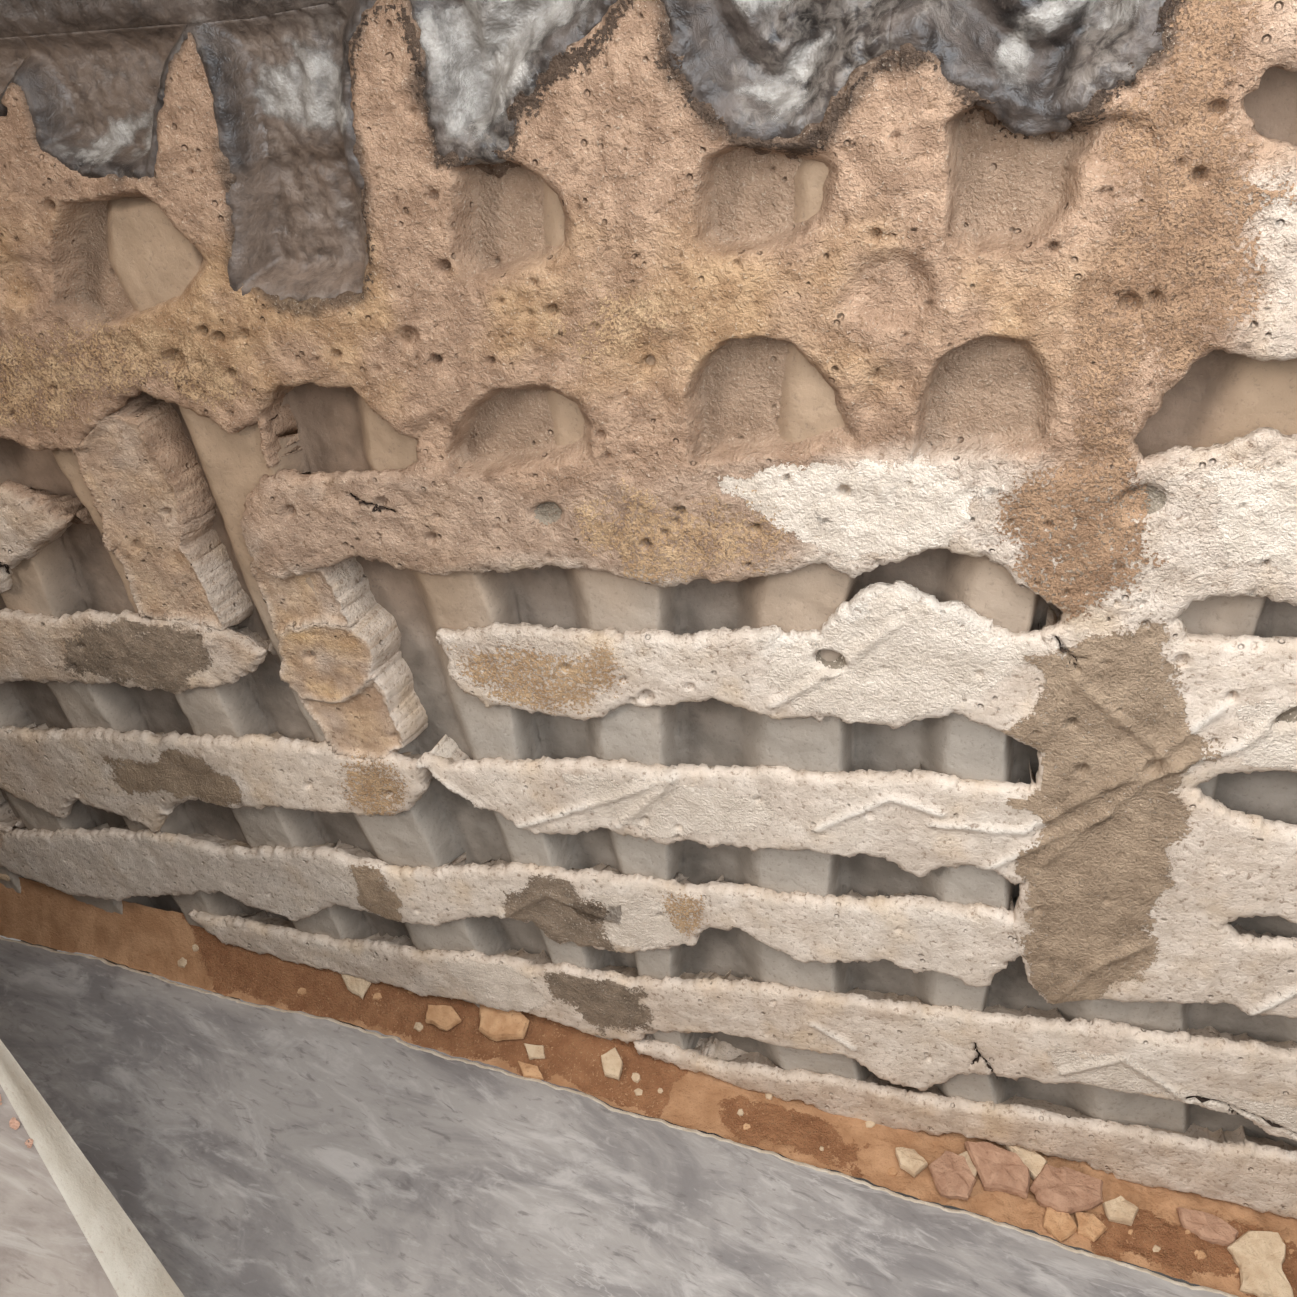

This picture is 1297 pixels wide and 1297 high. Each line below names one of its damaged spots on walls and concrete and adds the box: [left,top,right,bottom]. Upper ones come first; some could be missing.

water stain [0,0,633,315]
spalling [717,451,1012,571]
water stain [654,0,1297,1004]
spalling [1205,459,1297,574]
water stain [61,610,213,693]
spalling [758,591,1035,723]
water stain [103,748,245,808]
spalling [1236,699,1297,771]
water stain [495,874,616,952]
water stain [544,971,654,1037]
spalling [1047,1045,1297,1141]
flaking render [959,1141,1139,1243]